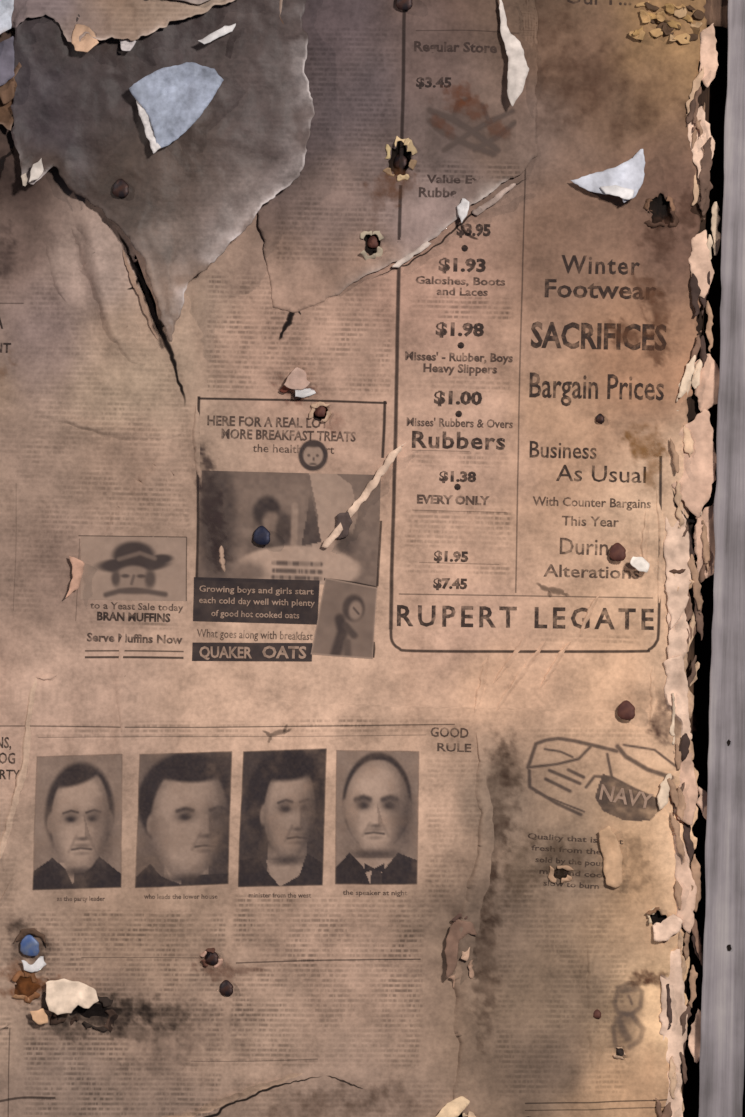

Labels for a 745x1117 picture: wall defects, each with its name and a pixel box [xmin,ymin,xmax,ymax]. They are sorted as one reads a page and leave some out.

peeling [360,231,384,260]
crack [381,213,477,275]
crack [119,236,185,398]
leakage [57,995,156,1035]
crack [162,1073,361,1117]